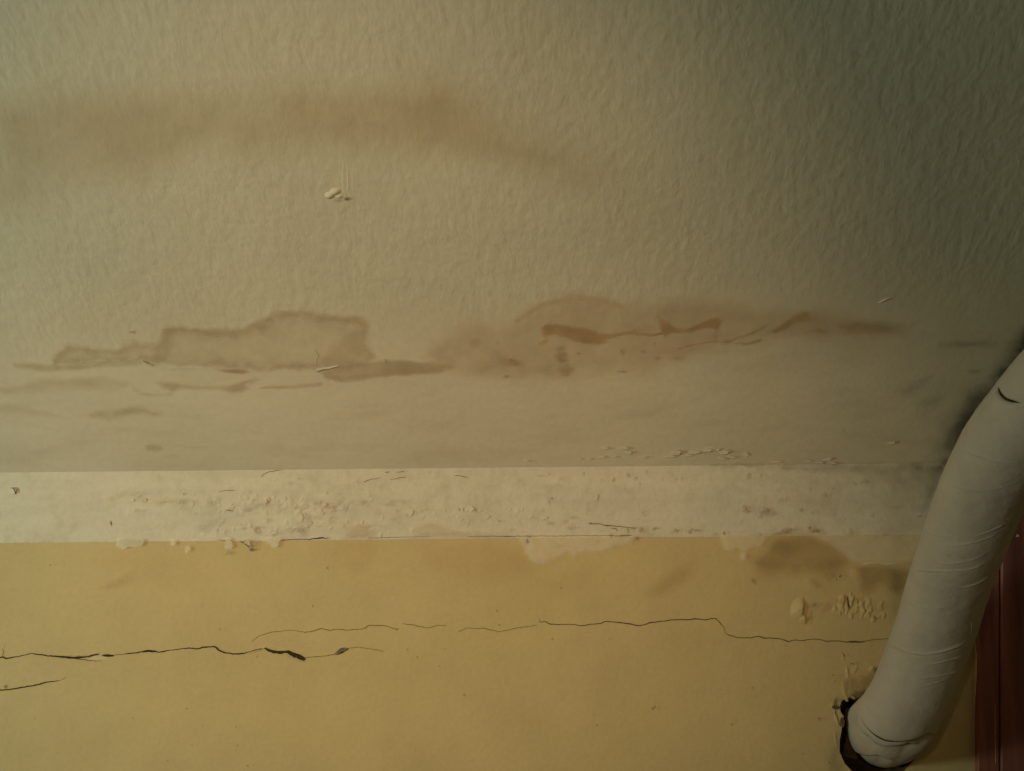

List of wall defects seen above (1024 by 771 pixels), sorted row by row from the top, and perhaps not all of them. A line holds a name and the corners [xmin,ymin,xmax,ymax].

leakage [541,318,720,344]
leakage [380,362,444,376]
crack [0,618,880,691]
spalling [830,652,877,751]